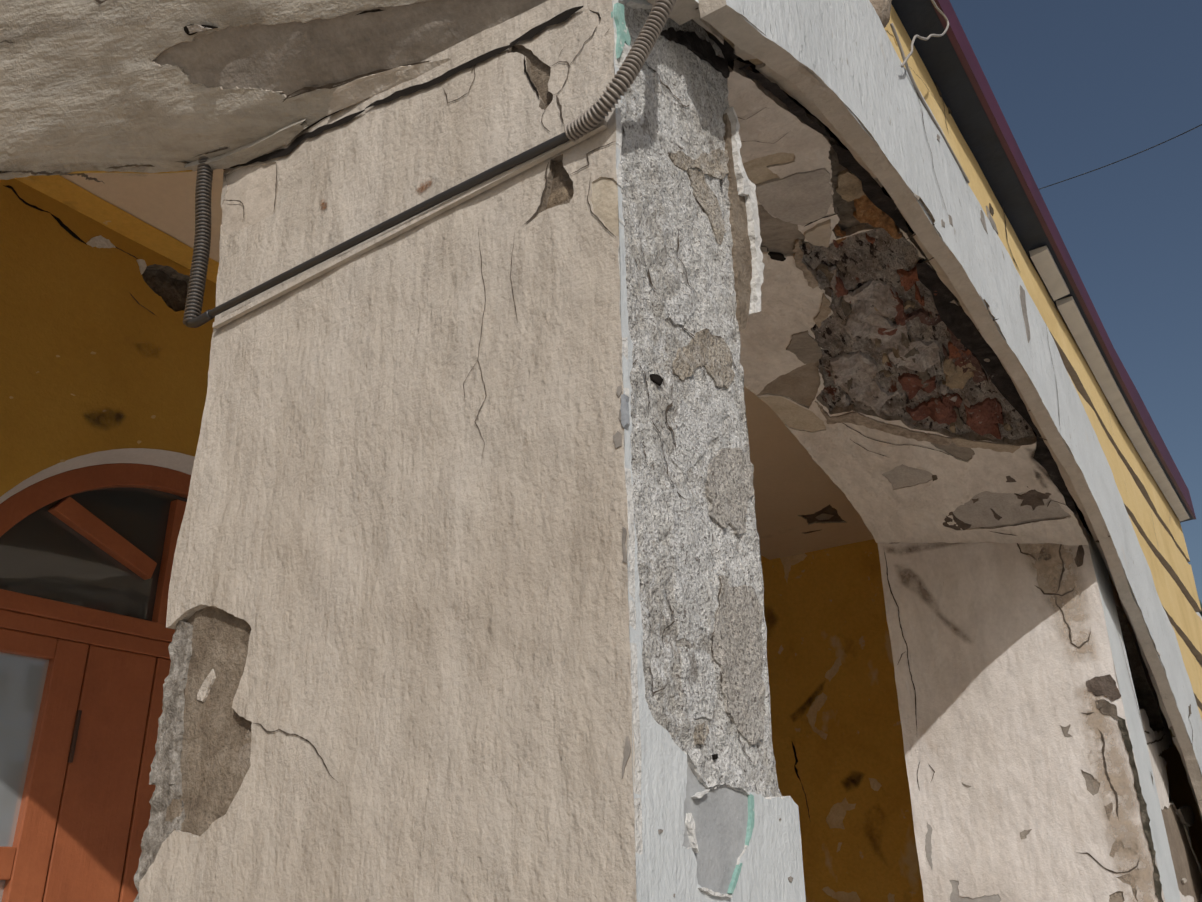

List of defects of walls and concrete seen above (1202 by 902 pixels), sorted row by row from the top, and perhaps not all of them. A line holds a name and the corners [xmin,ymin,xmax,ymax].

spalling [618,0,653,66]
crack [0,6,583,259]
crack [463,233,518,464]
spalling [613,17,1039,898]
flaking render [943,476,1091,648]
spalling [133,604,218,902]
spalling [236,723,335,780]
flaking render [1080,728,1119,820]
spalling [1083,606,1171,758]
peeling [949,880,1001,902]
flaking render [1077,840,1140,902]
flaking render [1161,801,1202,902]